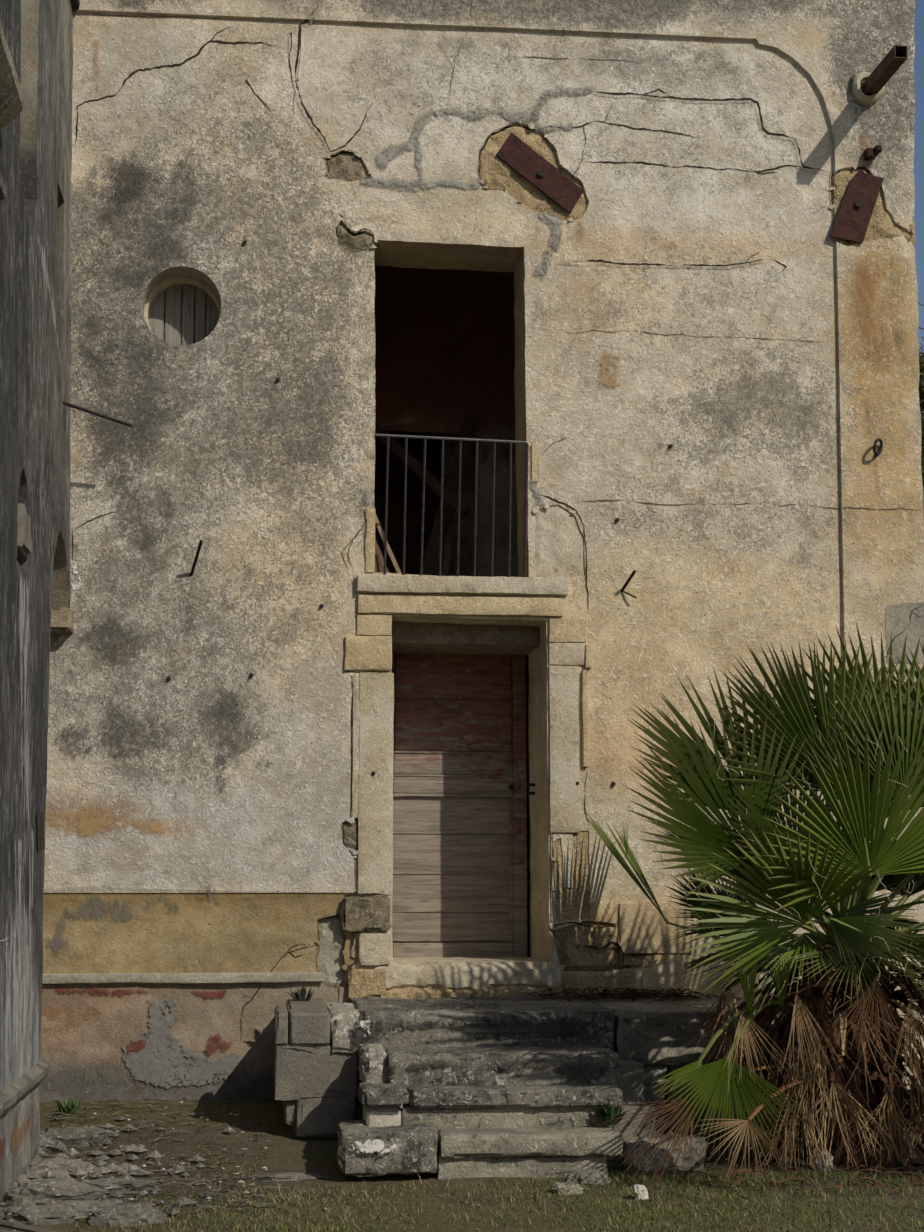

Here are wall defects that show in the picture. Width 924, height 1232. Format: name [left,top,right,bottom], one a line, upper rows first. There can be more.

crack [75,0,373,155]
crack [524,55,639,63]
spalling [322,150,372,181]
spalling [336,220,378,253]
spalling [477,121,588,222]
crack [537,89,840,178]
spalling [828,164,916,247]
leakage [78,314,179,550]
leakage [78,613,150,667]
leakage [52,698,183,760]
leakage [201,687,272,793]
peeling [205,1033,232,1055]